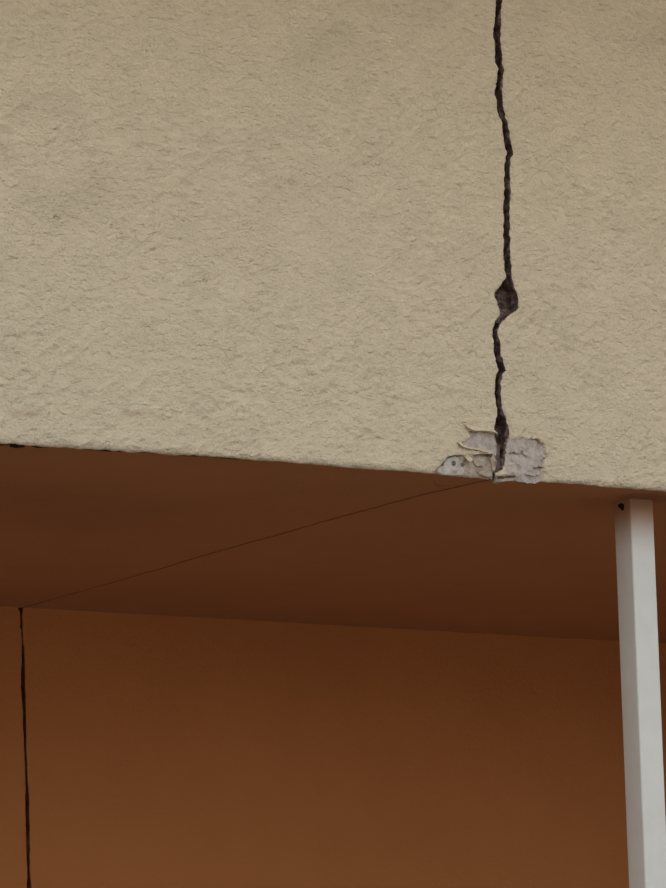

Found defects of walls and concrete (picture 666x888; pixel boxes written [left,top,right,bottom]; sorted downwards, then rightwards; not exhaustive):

crack [17,0,519,888]
flaking render [434,424,546,484]